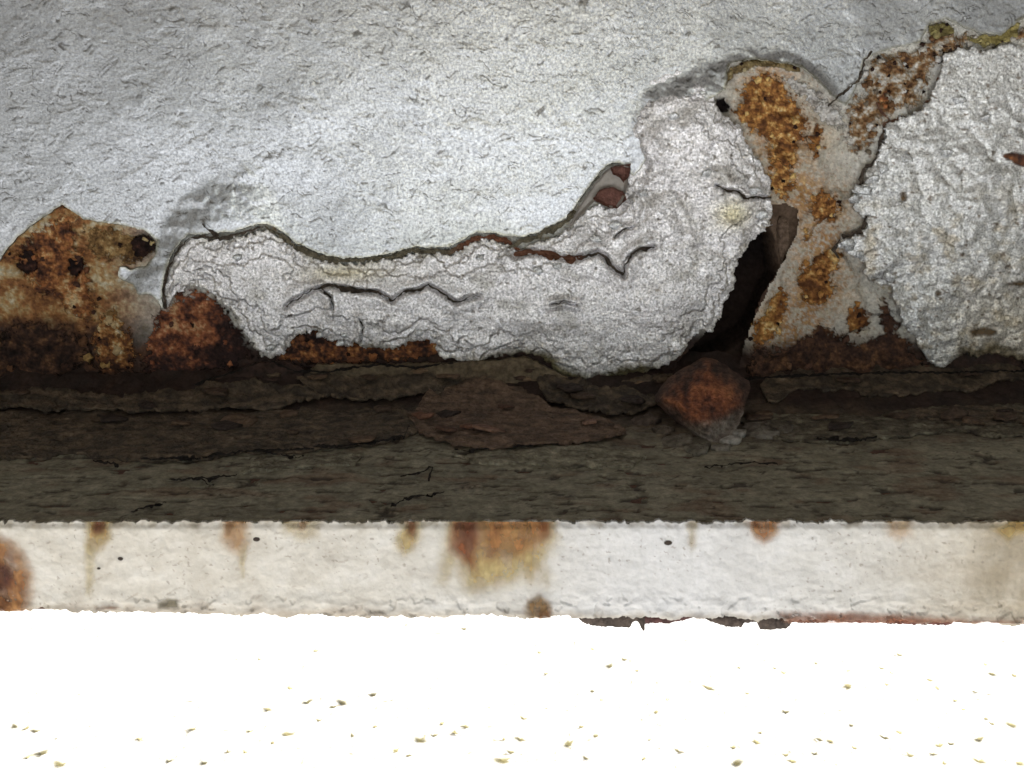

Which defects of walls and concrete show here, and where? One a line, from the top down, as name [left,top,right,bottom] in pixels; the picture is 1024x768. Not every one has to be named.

rust [726,59,826,201]
spalling [16,250,38,275]
spalling [67,258,86,279]
spalling [130,234,156,258]
rust [0,207,453,376]
crack [162,210,655,310]
peeling [162,70,773,384]
crack [716,185,771,200]
rust [744,248,1024,381]
rust [0,540,30,611]
rust [453,521,549,584]
rust [527,597,550,619]